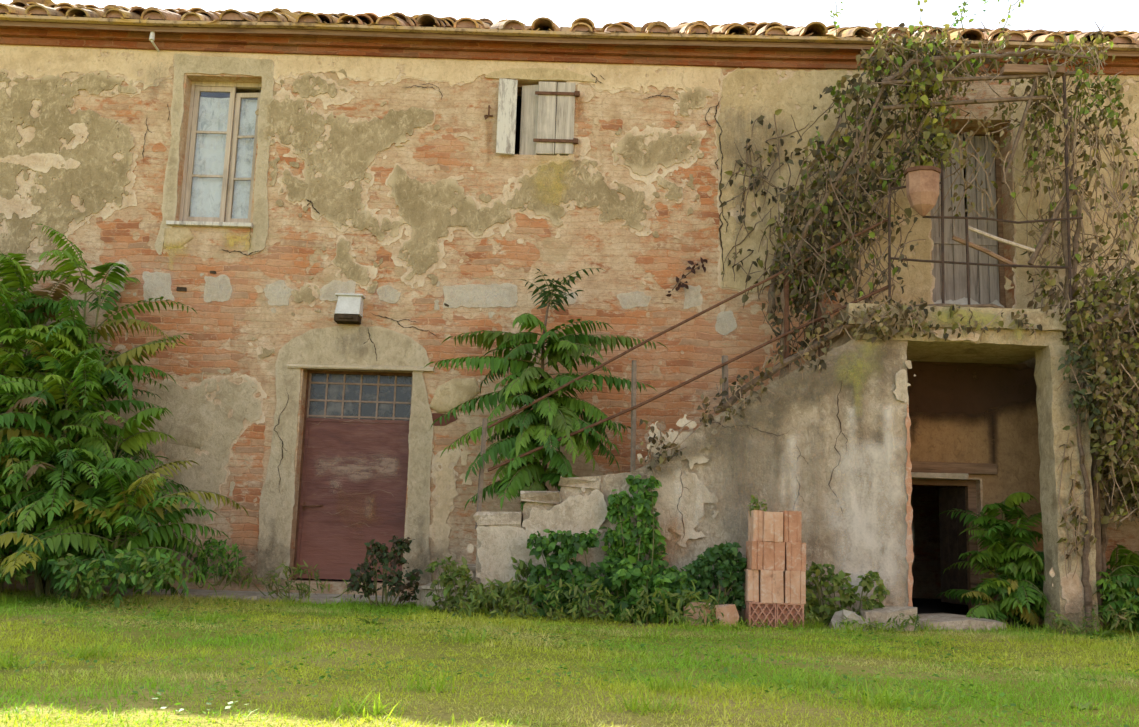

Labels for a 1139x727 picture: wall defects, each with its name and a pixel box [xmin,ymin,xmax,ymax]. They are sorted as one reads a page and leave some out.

flaking render [0,45,1139,607]
crack [714,369,848,548]
spalling [1049,568,1095,614]